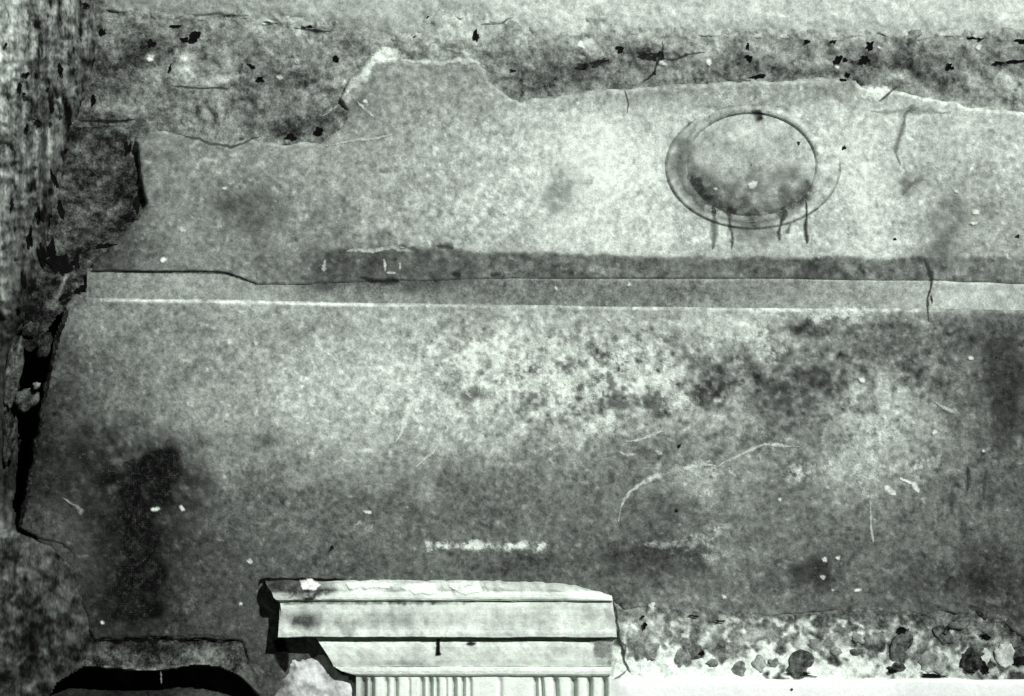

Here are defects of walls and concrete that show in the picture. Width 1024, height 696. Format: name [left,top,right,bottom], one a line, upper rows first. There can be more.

spalling [21,0,1024,351]
damp [698,177,735,248]
damp [777,191,809,243]
crack [924,259,934,320]
peeling [707,313,787,358]
crack [19,528,75,558]
damp [64,419,212,641]
spalling [611,595,1024,690]